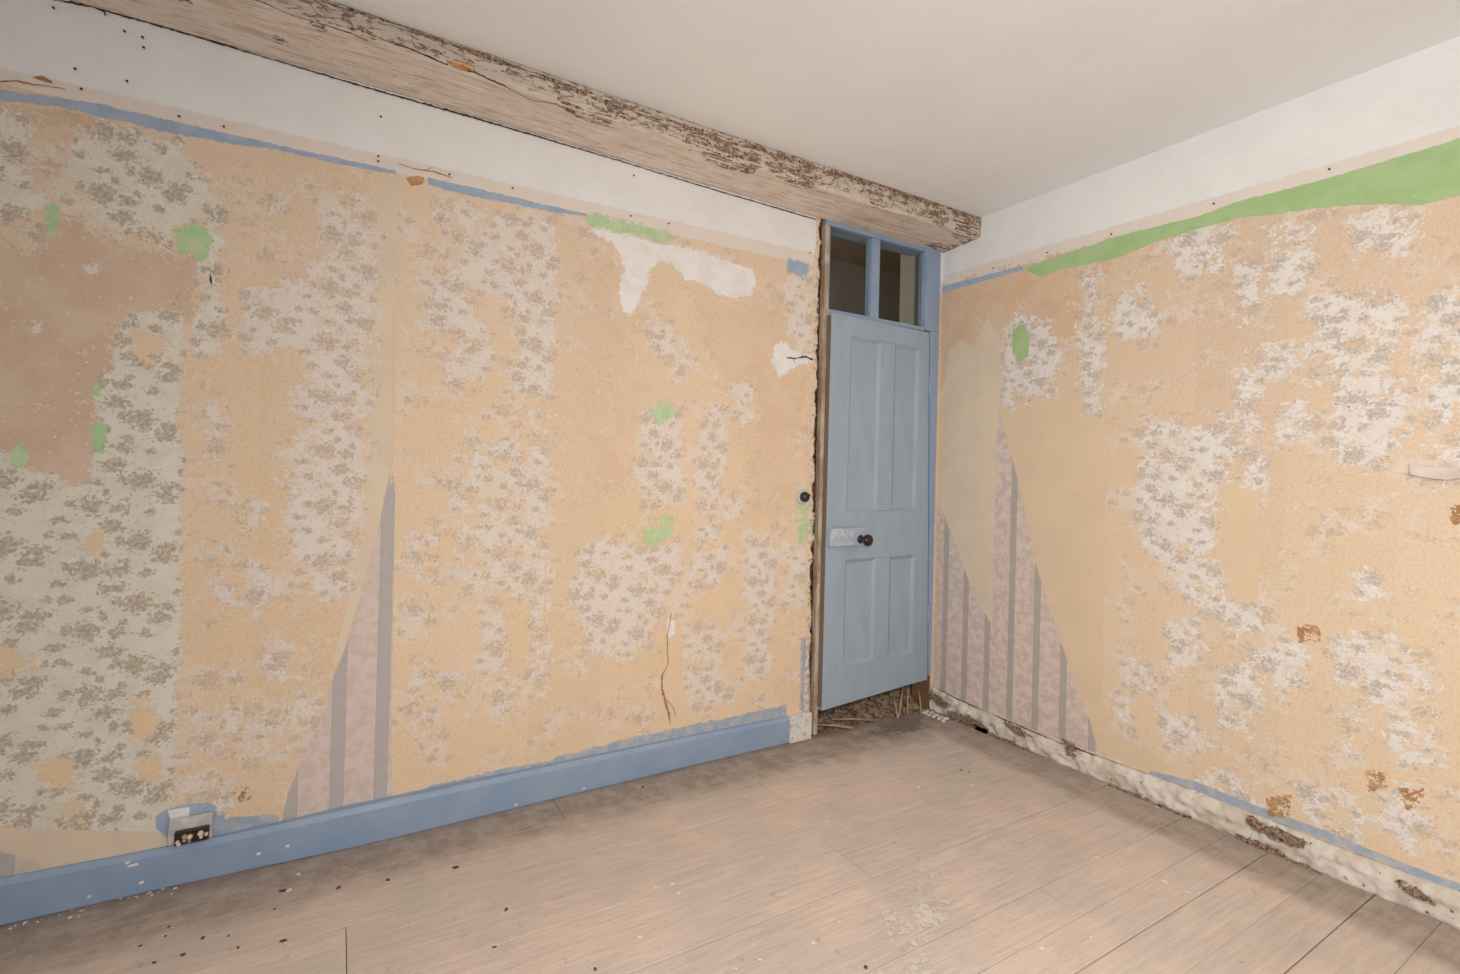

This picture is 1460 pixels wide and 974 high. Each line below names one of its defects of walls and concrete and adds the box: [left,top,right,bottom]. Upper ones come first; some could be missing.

peeling [309,0,981,253]
peeling [126,225,230,370]
peeling [591,225,756,425]
peeling [1073,264,1110,417]
peeling [1162,205,1460,497]
peeling [666,217,822,712]
peeling [25,756,87,826]
peeling [126,638,326,836]
peeling [399,560,558,747]
crack [661,614,676,721]
spalling [928,591,1460,930]
peeling [1347,565,1387,602]